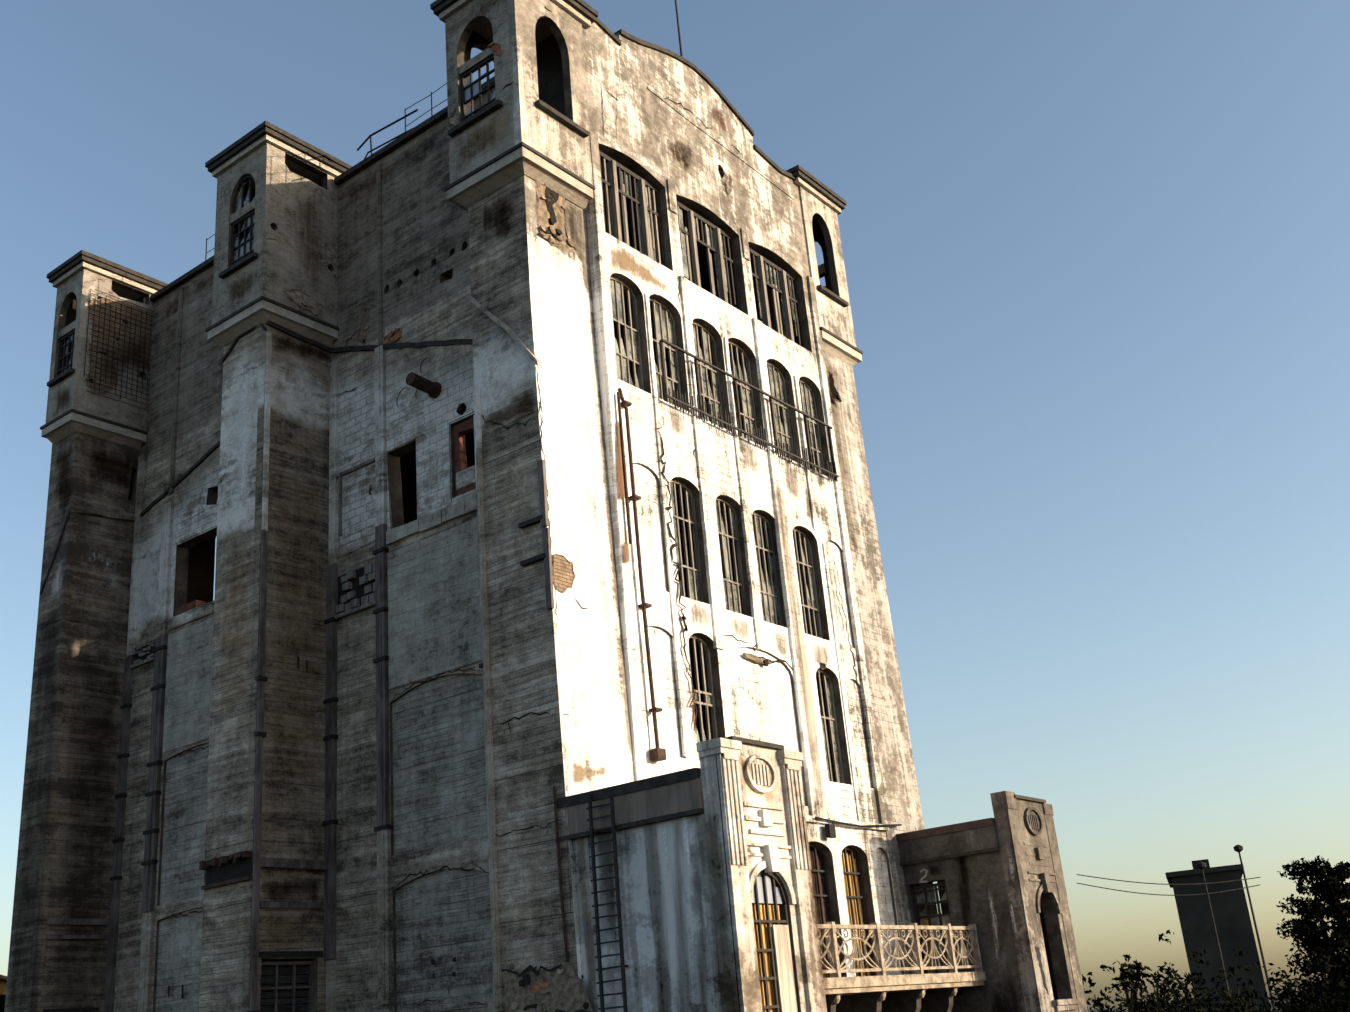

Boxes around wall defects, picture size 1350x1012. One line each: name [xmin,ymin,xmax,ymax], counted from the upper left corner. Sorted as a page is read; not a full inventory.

rust [617,422,625,499]
spalling [552,553,575,594]
spalling [503,964,593,1012]